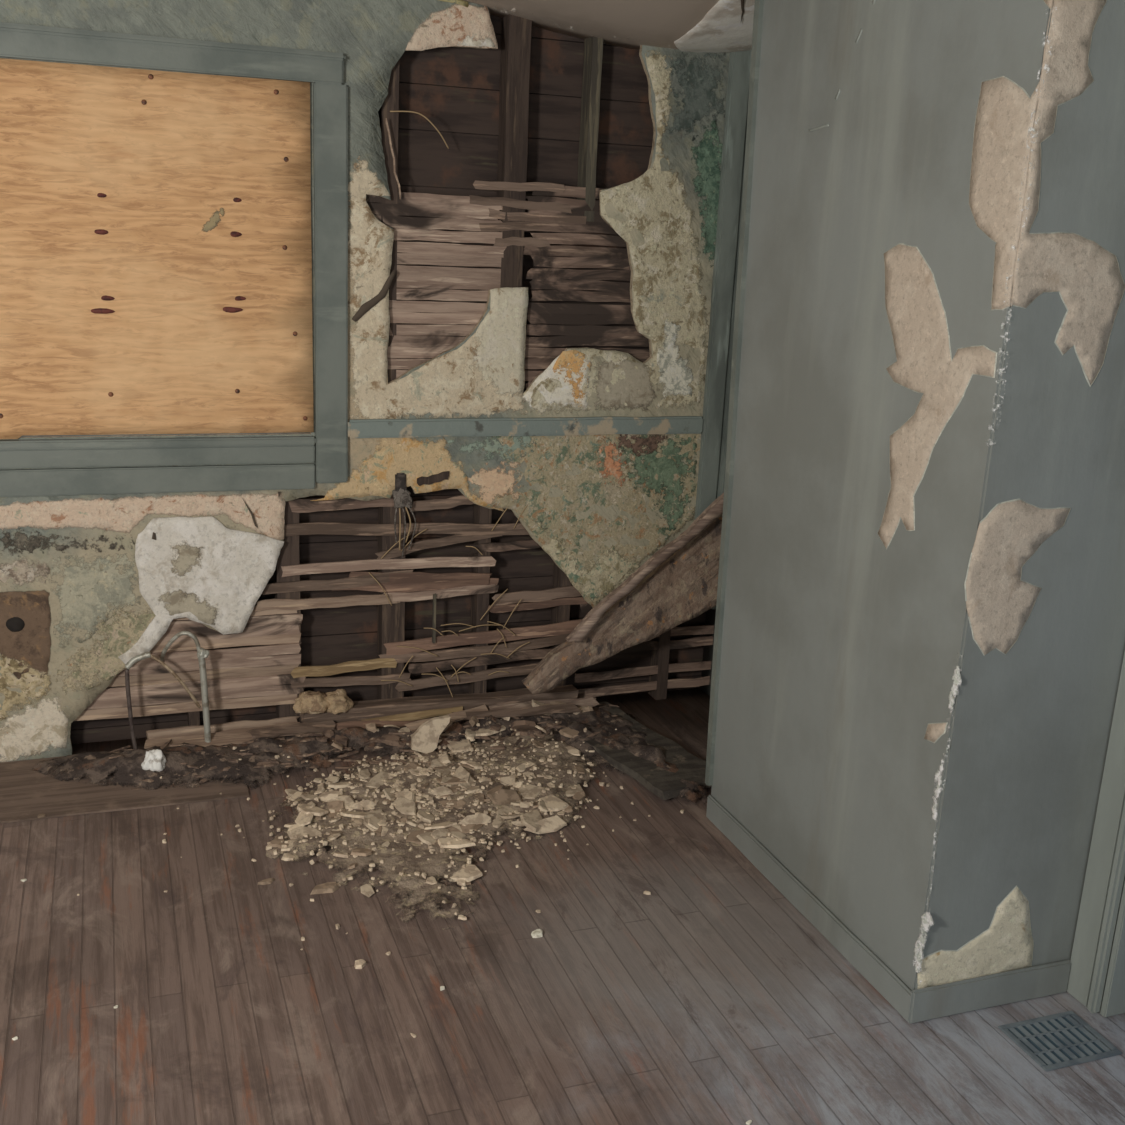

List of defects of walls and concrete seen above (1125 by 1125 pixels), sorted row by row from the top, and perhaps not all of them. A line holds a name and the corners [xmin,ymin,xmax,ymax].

spalling [348,4,723,419]
peeling [877,0,1125,549]
spalling [0,434,714,762]
peeling [964,498,1071,656]
spalling [924,666,962,868]
peeling [914,884,1034,989]